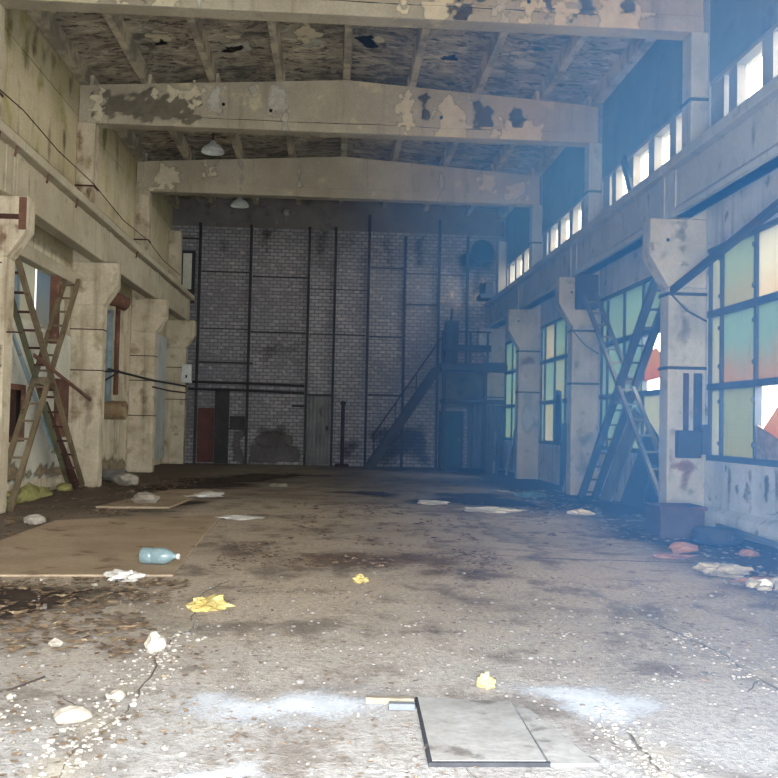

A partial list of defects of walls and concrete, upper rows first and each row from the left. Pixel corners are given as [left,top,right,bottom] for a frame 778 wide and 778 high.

peeling [421,0,656,29]
peeling [83,80,208,125]
peeling [394,90,545,141]
crack [12,580,230,778]
crack [584,586,778,693]
crack [591,687,681,778]